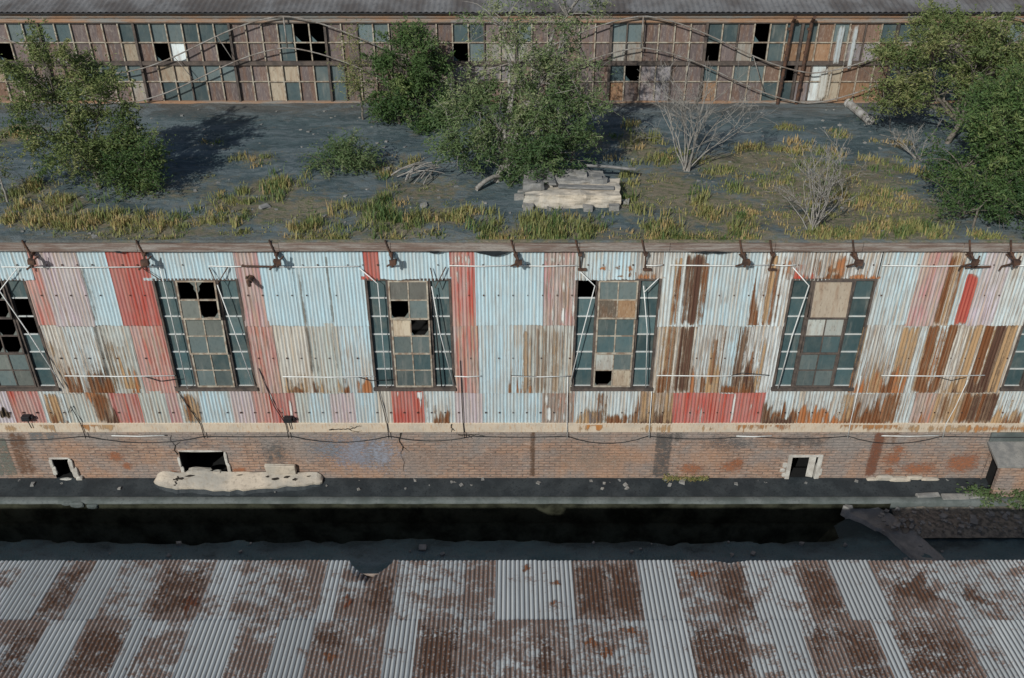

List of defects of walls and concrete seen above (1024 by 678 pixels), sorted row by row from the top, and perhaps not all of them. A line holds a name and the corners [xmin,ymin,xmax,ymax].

rust [39,342,141,433]
rust [181,394,201,423]
rust [579,254,821,433]
rust [737,256,1024,476]
rust [63,626,131,678]
rust [146,568,205,619]
rust [415,625,459,678]
rust [573,562,648,635]
rust [687,563,759,677]
rust [798,564,887,678]
rust [893,625,976,678]
rust [892,565,995,612]